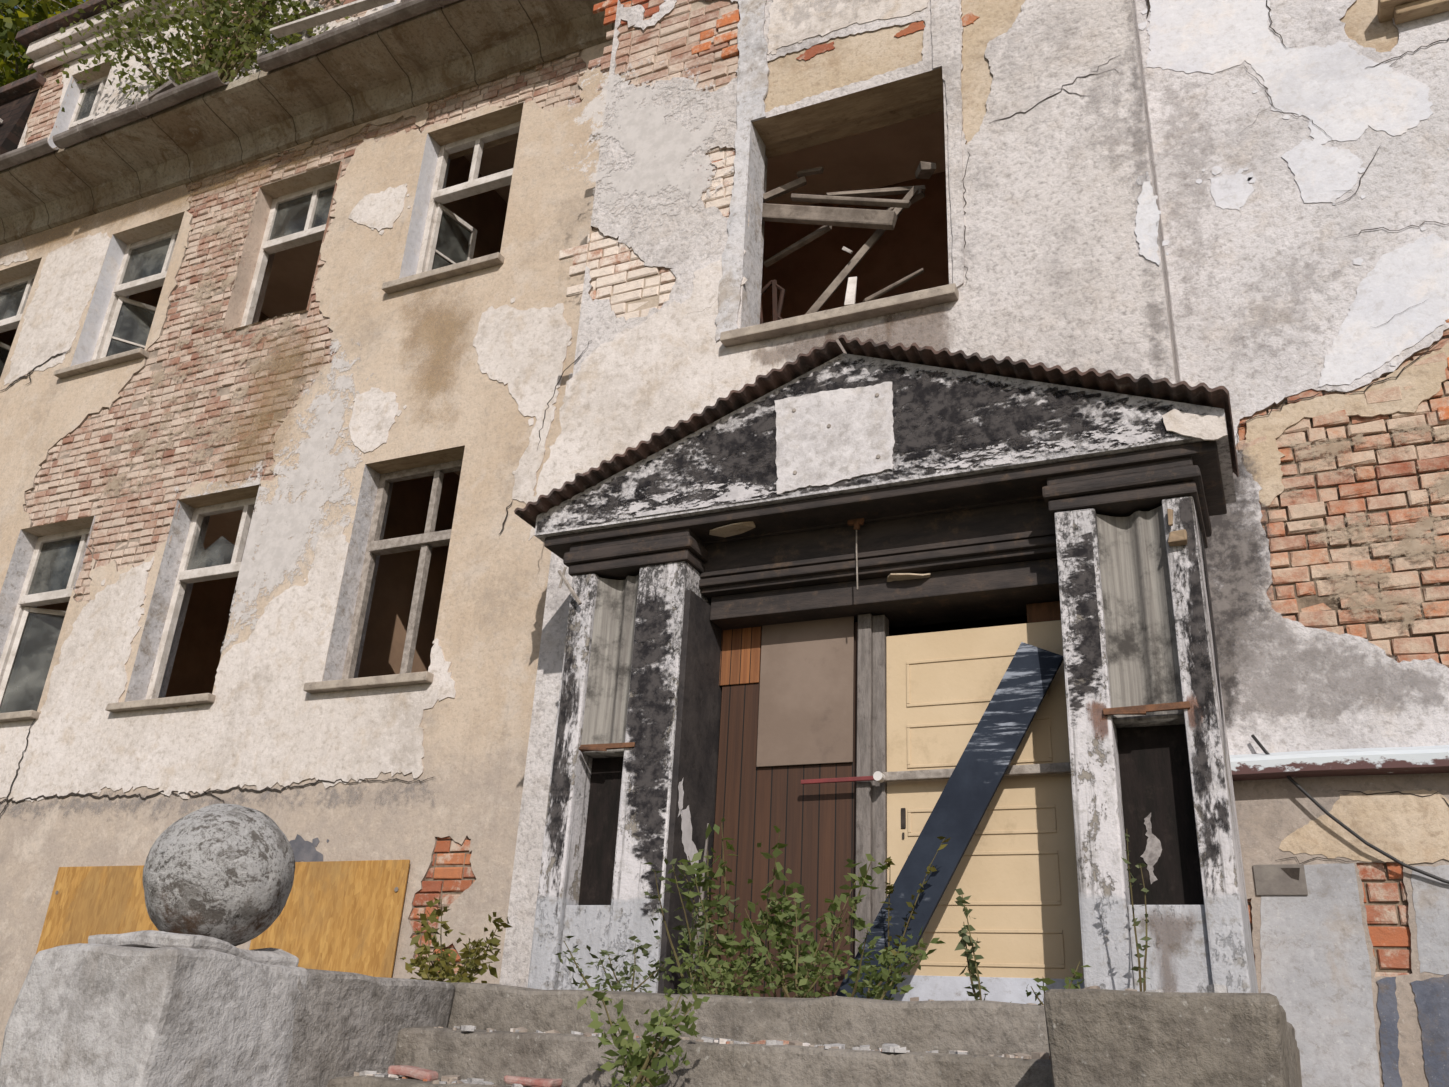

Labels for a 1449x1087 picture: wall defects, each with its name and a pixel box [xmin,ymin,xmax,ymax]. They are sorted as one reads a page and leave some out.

crack [990,55,1120,123]
crack [1365,38,1449,69]
water stain [1133,0,1181,382]
crack [1334,146,1449,238]
flaking render [0,0,786,803]
water stain [549,481,782,530]
water stain [889,421,1161,481]
flaking render [1162,226,1449,668]
water stain [1187,450,1443,896]
crack [0,719,433,815]
flaking render [408,836,476,977]
flaking render [1279,789,1449,1087]